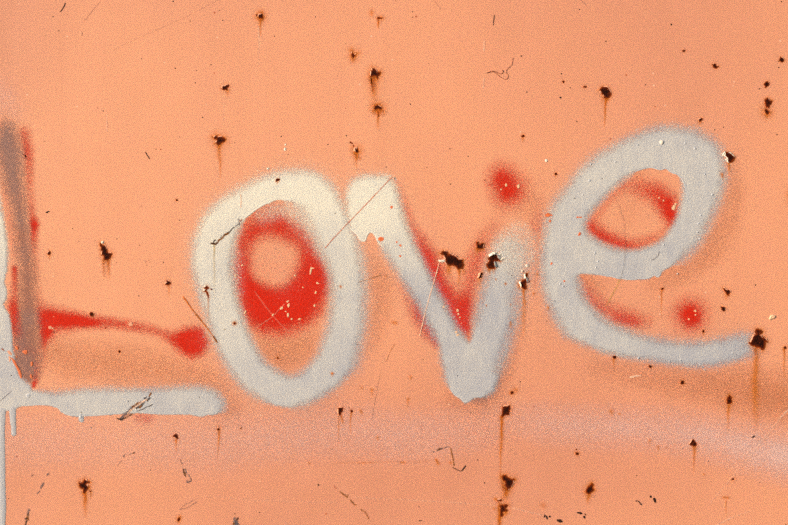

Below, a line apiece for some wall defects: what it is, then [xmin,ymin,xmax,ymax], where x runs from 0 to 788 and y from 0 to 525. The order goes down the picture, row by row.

corrosion [370,68,384,120]
corrosion [599,86,612,116]
corrosion [212,135,226,162]
corrosion [721,151,735,177]
corrosion [100,241,112,268]
corrosion [438,250,464,274]
corrosion [476,242,506,278]
corrosion [749,328,768,404]
corrosion [500,405,511,452]
corrosion [78,479,91,507]
corrosion [494,474,516,525]